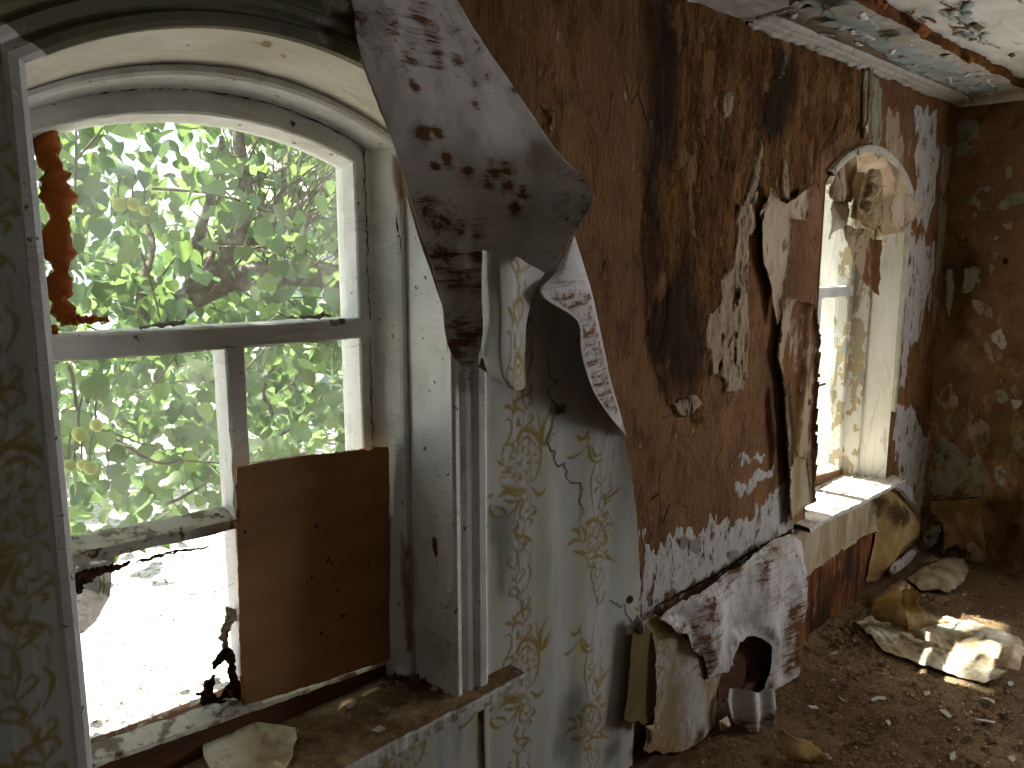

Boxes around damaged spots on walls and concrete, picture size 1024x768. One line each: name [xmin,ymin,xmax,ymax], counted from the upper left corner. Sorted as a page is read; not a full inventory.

water stain [646,1,677,292]
flaking render [641,0,1007,426]
crack [546,320,585,519]
peeling [627,452,795,621]
peeling [893,404,1006,544]
peeling [995,388,1023,409]